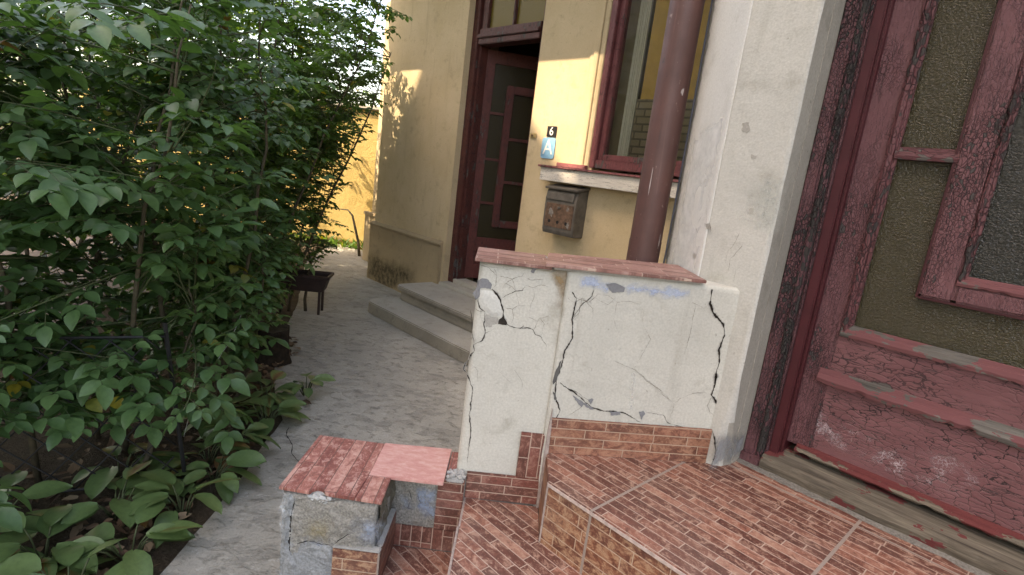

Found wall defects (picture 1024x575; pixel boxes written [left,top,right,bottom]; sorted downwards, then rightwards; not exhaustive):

peeling [473,278,507,327]
crack [463,265,725,465]